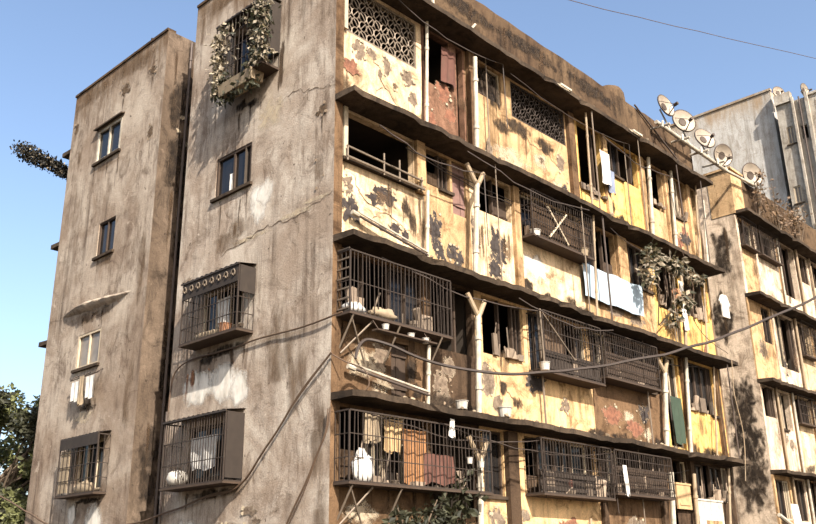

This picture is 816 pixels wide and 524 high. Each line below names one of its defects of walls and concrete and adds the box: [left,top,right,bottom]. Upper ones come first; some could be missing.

damp [166,54,193,271]
crack [223,190,333,255]
peeling [601,403,650,438]
peeling [241,505,261,524]